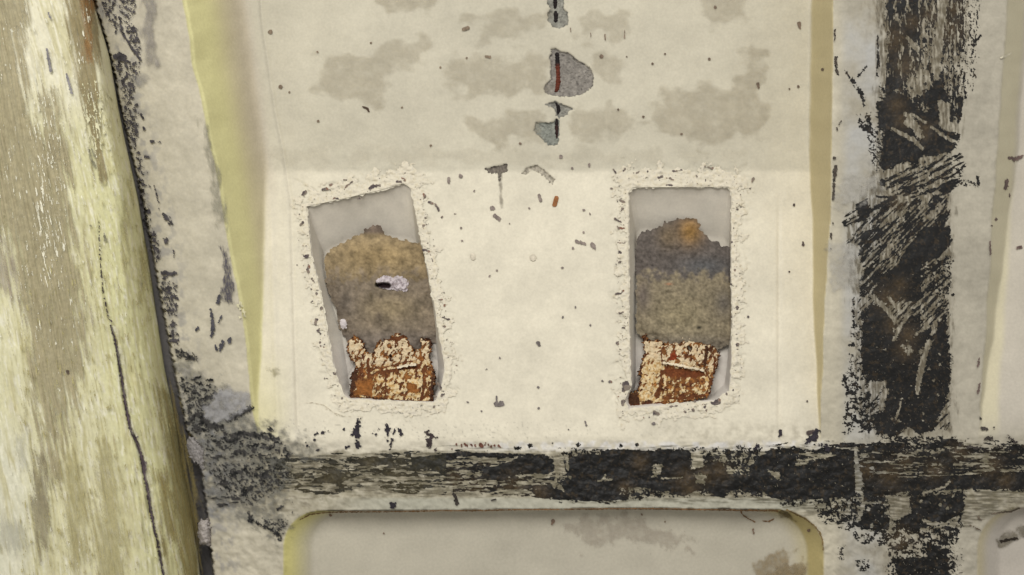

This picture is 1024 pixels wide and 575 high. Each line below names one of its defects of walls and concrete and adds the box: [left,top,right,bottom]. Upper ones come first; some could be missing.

crack [98,222,167,575]
water stain [101,0,316,575]
peeling [265,0,1024,575]